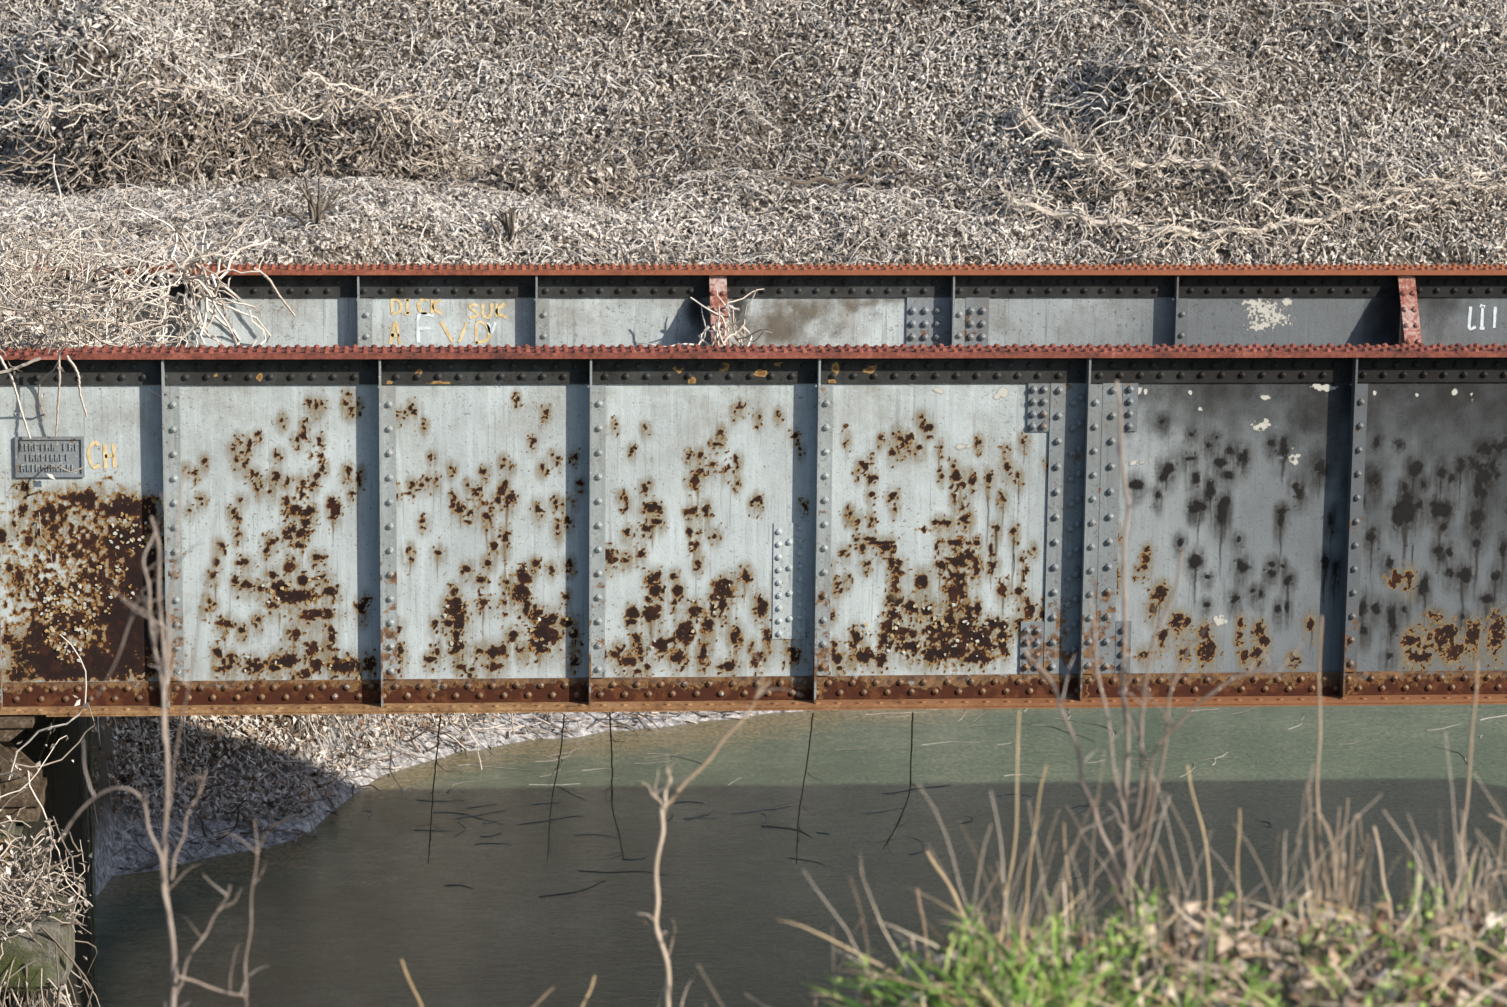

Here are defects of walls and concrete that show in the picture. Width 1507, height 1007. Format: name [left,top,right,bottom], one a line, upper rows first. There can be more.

corrosion [396,369,450,432]
corrosion [0,389,1507,706]